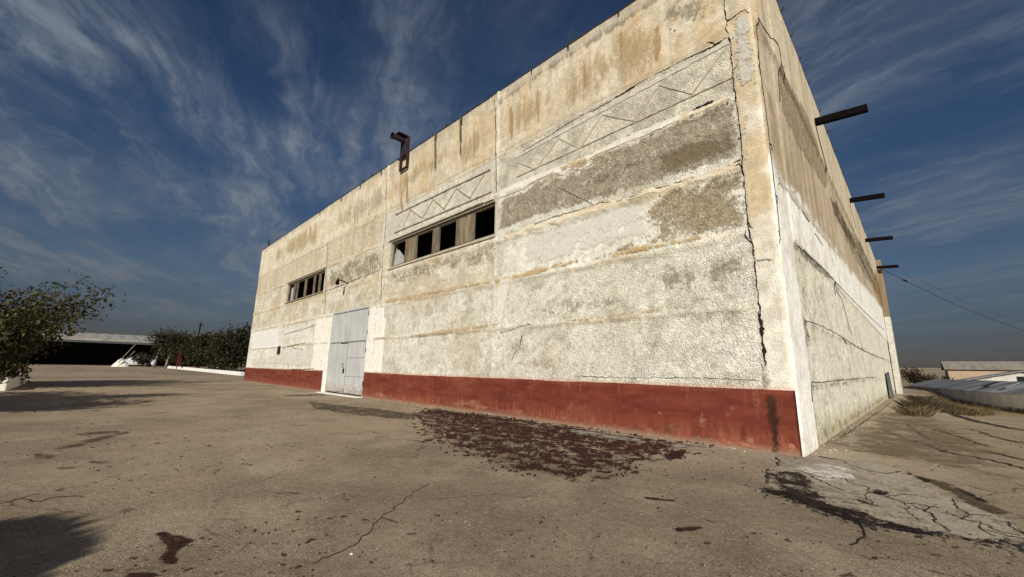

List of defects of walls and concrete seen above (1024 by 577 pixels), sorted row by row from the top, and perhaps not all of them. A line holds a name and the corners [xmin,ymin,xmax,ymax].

rust [569,24,661,100]
rust [509,90,539,137]
spalling [778,66,828,187]
spalling [499,102,749,269]
crack [494,0,887,402]
spalling [832,200,858,250]
leakage [765,365,779,452]